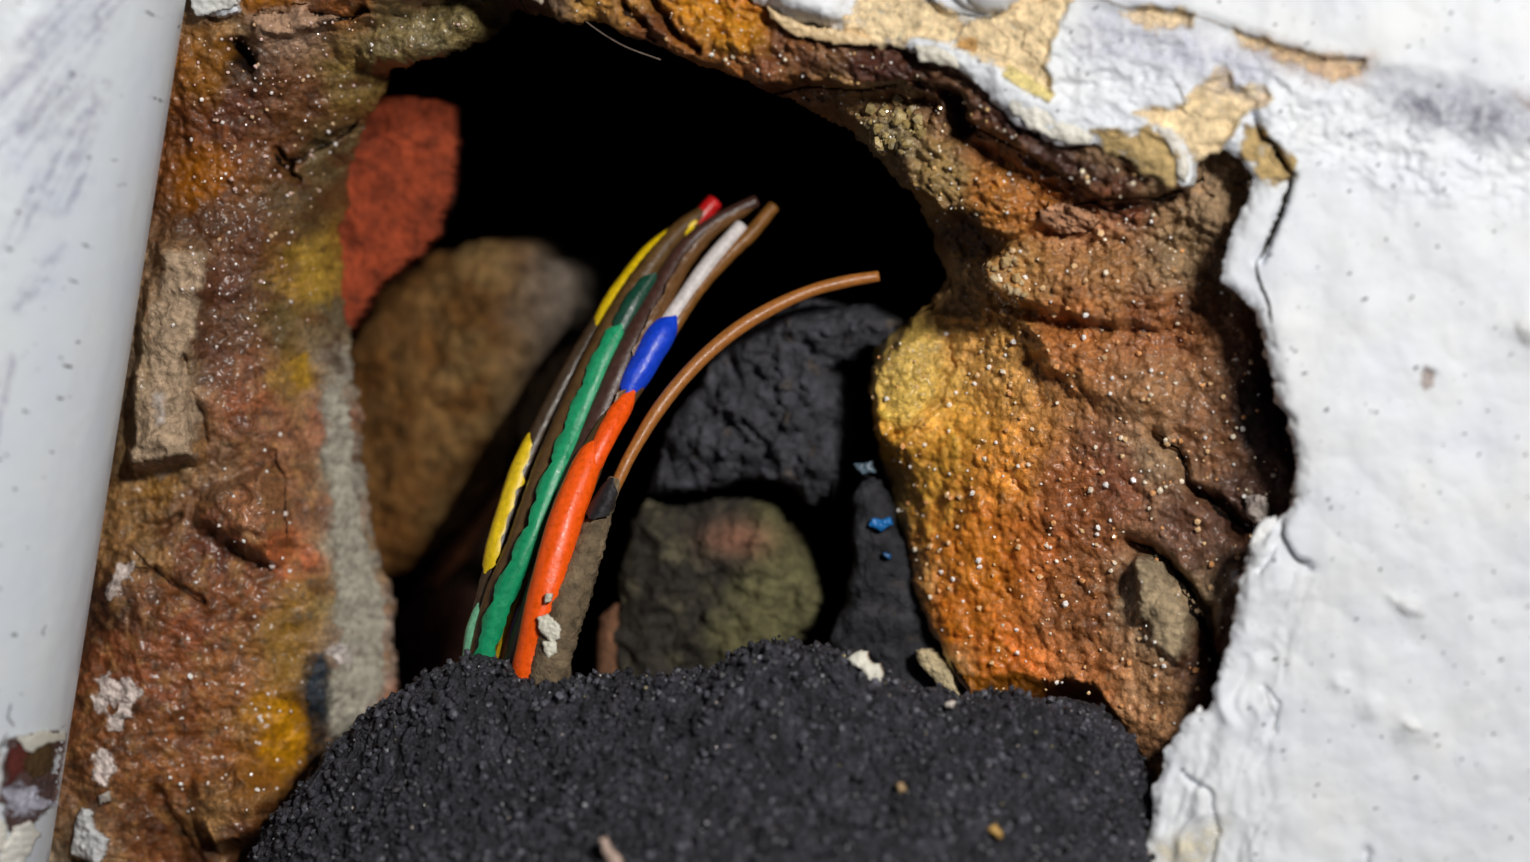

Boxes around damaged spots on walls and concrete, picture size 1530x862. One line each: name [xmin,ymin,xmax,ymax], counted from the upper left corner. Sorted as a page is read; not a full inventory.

spalling [0,730,67,862]
spalling [49,0,529,862]
spalling [522,0,1297,797]
crack [1175,83,1294,324]